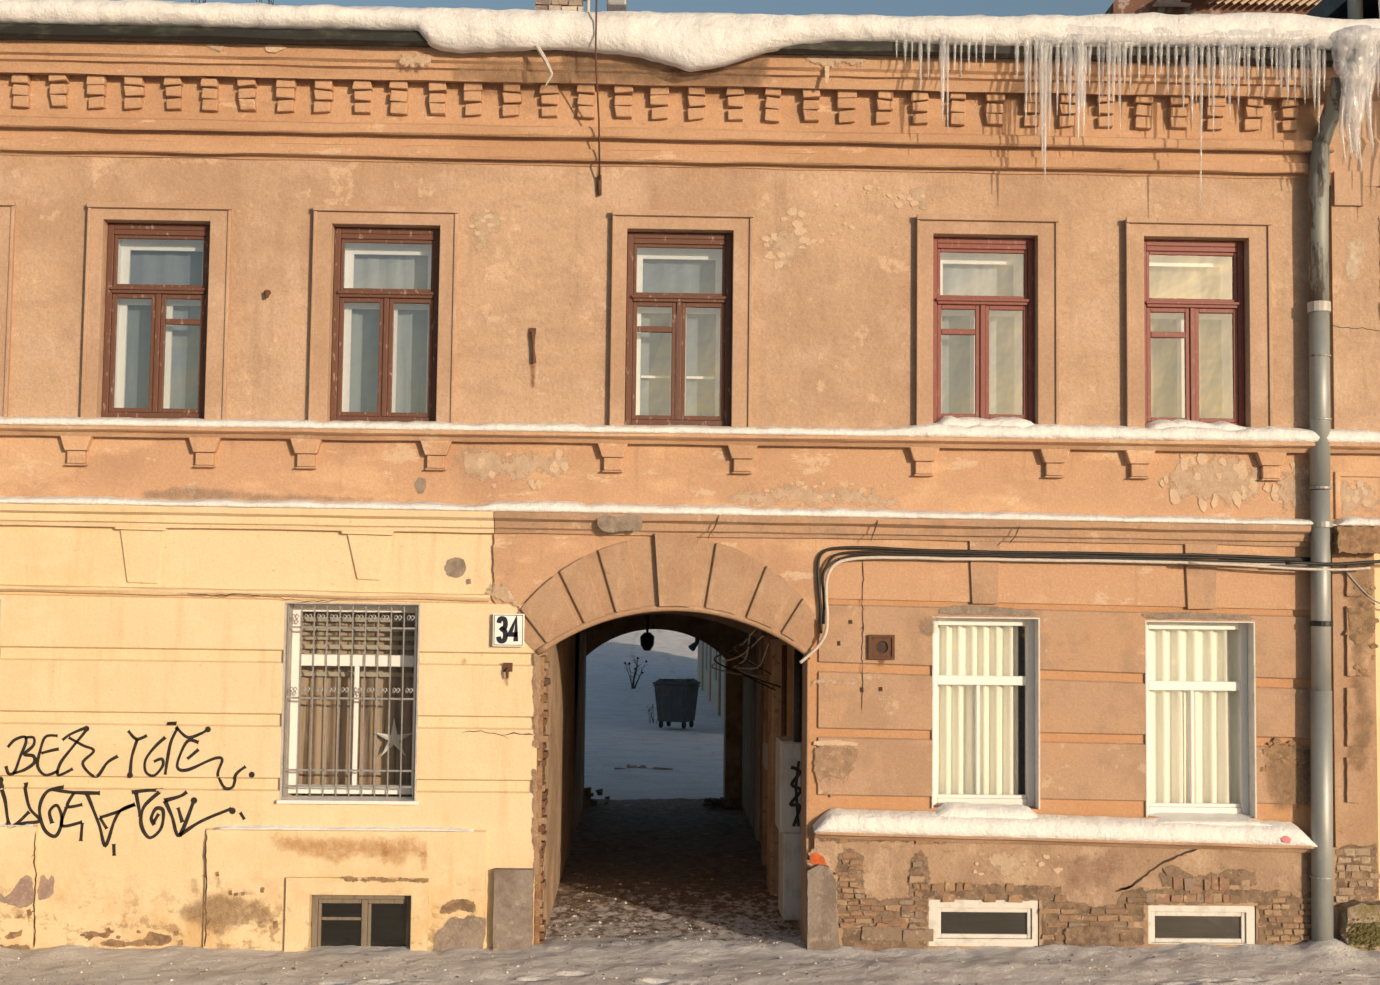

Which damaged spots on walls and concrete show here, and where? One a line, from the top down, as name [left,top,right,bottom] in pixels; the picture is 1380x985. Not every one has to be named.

flaking render [761,203,855,269]
flaking render [453,445,570,490]
flaking render [1159,452,1310,512]
flaking render [0,875,55,950]
damp [186,896,264,932]
flaking render [807,838,1311,951]
crack [1115,849,1198,892]